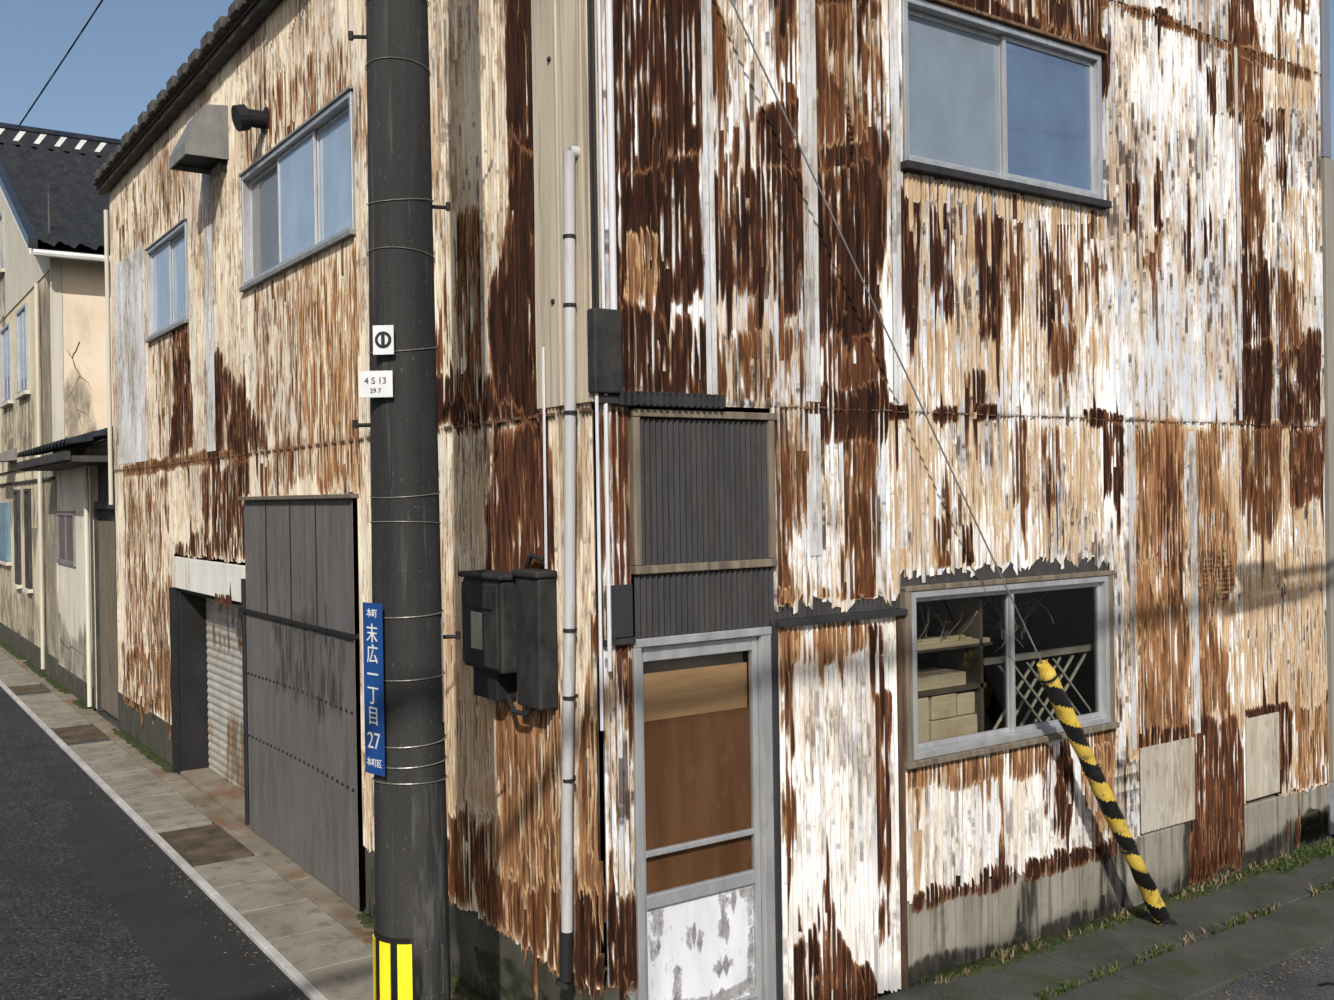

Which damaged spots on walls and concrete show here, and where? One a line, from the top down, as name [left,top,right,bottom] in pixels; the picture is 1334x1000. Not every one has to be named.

rust [121,241,363,741]
rust [435,0,638,1000]
rust [612,0,1329,1000]
rust [225,718,245,793]
leakage [411,783,500,1000]
peeling [648,906,664,965]
peeling [672,885,756,1000]